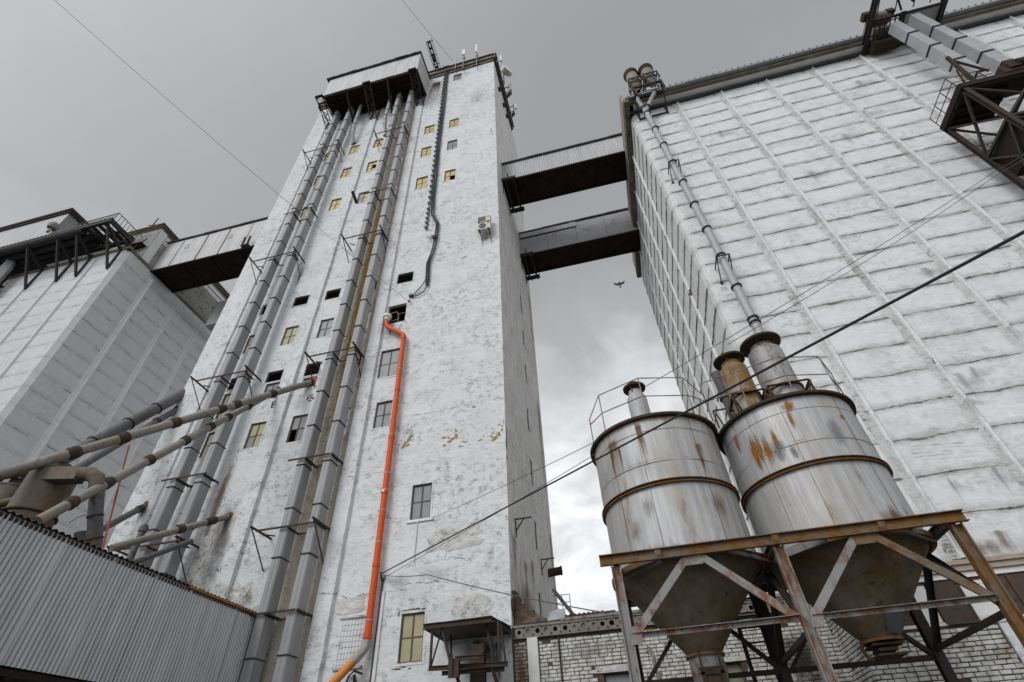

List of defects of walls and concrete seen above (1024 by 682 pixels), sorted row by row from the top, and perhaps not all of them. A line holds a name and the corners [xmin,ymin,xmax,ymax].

peeling [435,420,510,450]
corrosion [734,432,778,466]